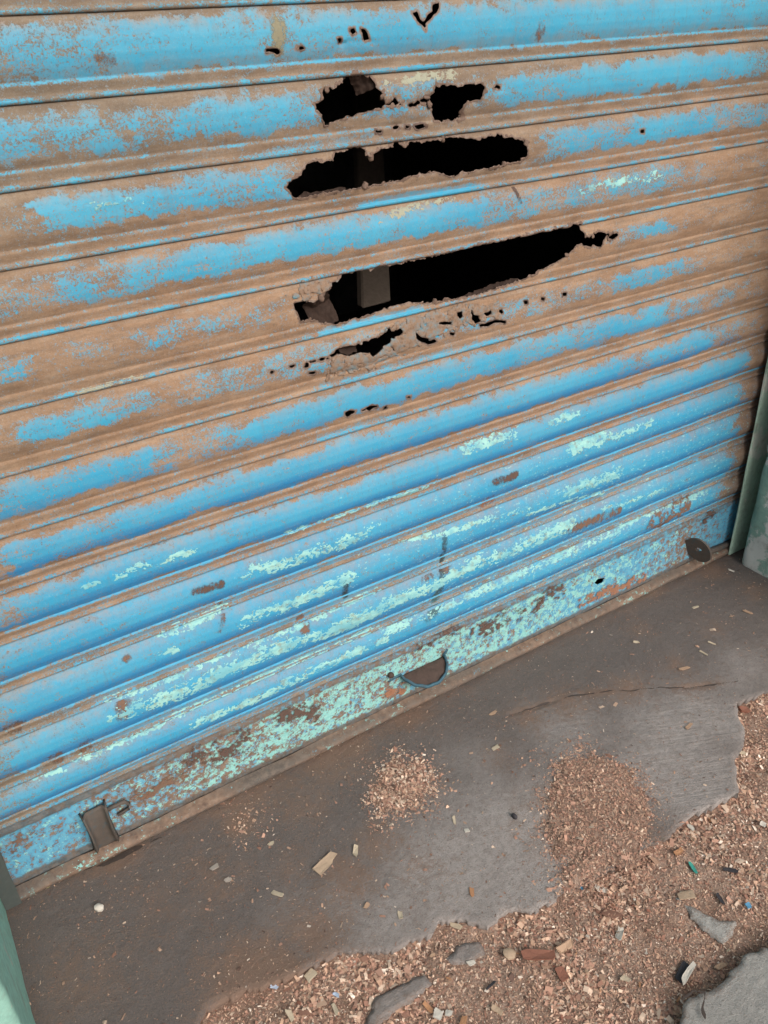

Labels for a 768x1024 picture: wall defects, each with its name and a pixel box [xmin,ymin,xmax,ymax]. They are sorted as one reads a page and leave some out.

peeling [349,68,461,109]
peeling [302,292,339,324]
peeling [338,345,357,355]
corrosion [325,298,502,382]
peeling [565,418,654,456]
peeling [387,465,666,550]
corrosion [568,506,622,533]
corrosion [646,495,691,530]
peeling [33,483,708,782]
corrosion [276,703,322,727]
crack [519,681,737,713]
corrosion [120,728,251,807]